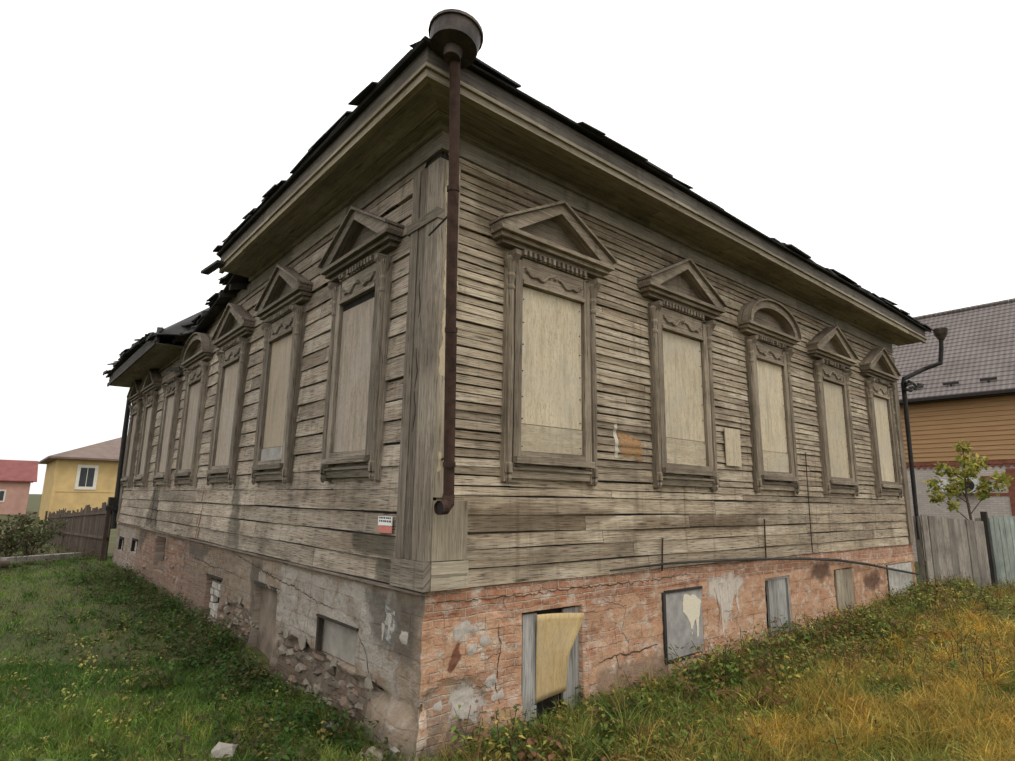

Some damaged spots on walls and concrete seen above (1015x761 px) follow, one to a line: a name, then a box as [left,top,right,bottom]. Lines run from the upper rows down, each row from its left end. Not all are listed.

crack [180,550,332,624]
flaking render [270,627,382,736]
peeling [381,606,408,645]
flaking render [419,619,504,761]
crack [477,638,502,703]
crack [432,574,691,666]